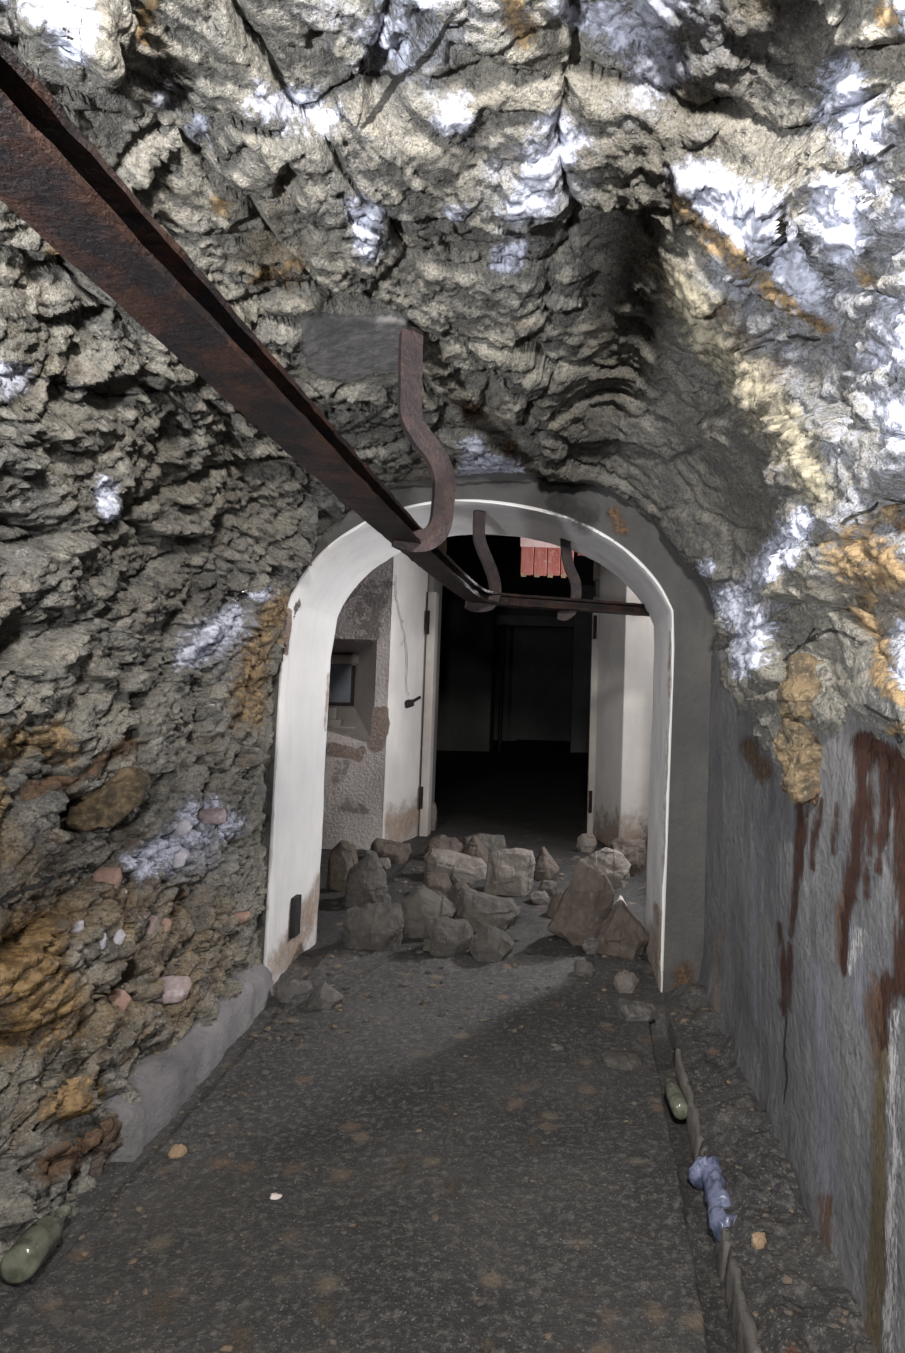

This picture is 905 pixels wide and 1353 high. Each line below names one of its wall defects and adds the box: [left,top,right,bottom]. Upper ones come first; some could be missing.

damp [3,0,99,63]
damp [360,0,442,72]
damp [874,0,905,41]
damp [245,81,340,135]
damp [430,95,479,139]
damp [345,196,386,263]
damp [490,107,589,273]
damp [667,57,905,376]
damp [645,259,905,736]
spalling [740,737,772,784]
damp [119,795,245,881]
corrosion [777,730,905,1074]